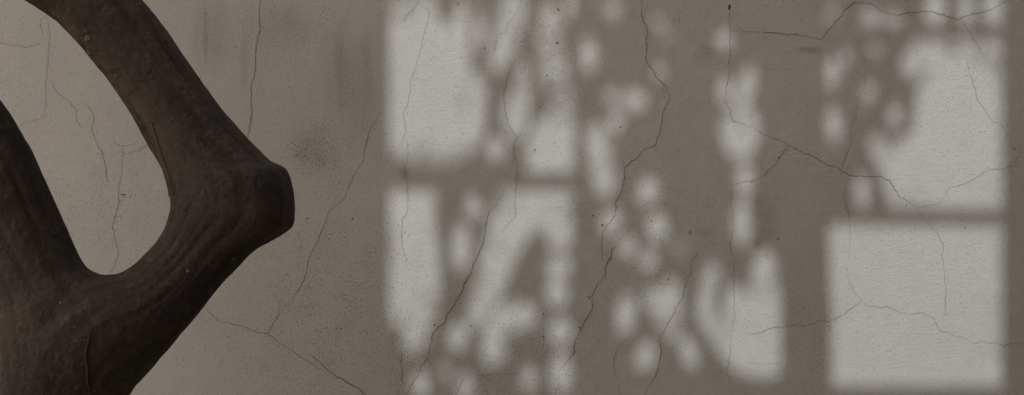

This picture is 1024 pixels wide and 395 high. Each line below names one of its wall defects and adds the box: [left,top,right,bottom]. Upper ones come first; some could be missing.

crack [247,0,262,135]
crack [204,116,378,395]
crack [396,0,531,395]
crack [555,0,670,395]
crack [710,0,1023,384]